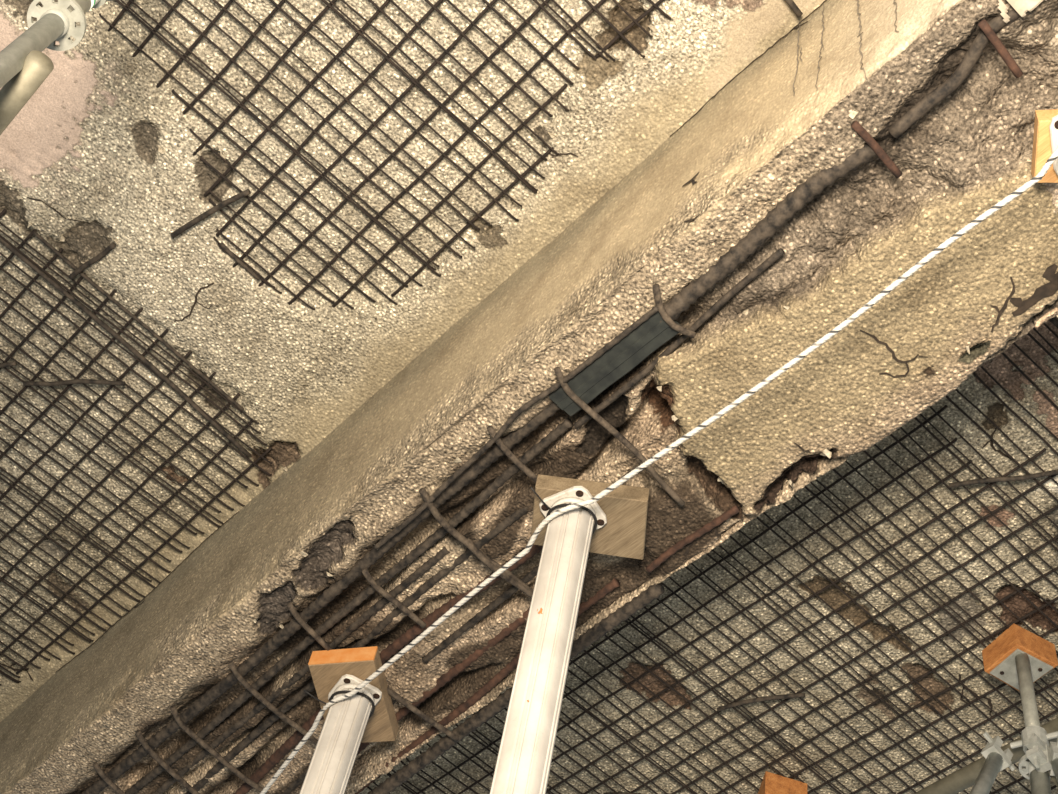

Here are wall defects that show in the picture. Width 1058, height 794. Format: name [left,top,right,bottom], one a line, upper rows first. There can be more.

peeling [0,0,58,51]
spalling [0,41,301,686]
spalling [99,0,671,310]
spalling [684,0,1058,323]
crack [860,330,927,378]
crack [990,264,1058,333]
spalling [1027,308,1058,364]
spalling [70,340,1058,794]